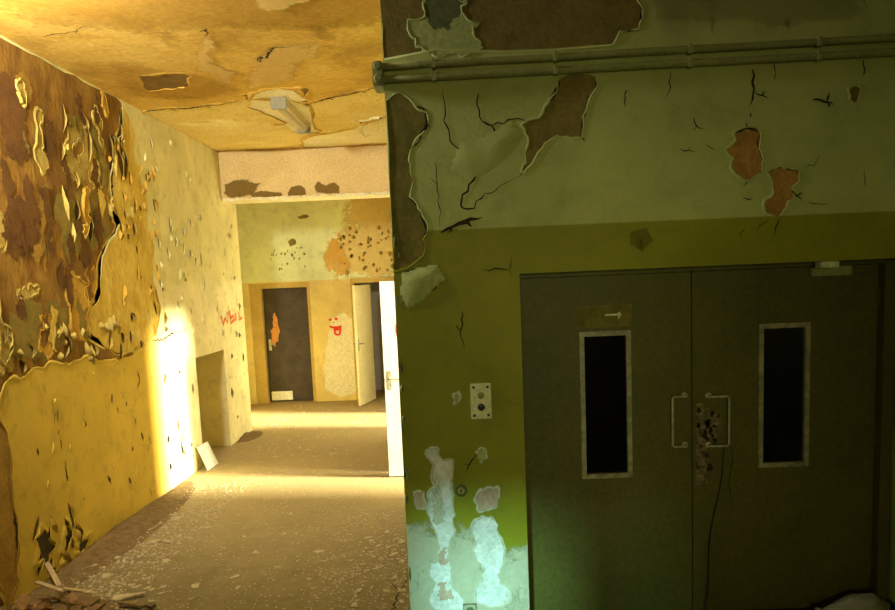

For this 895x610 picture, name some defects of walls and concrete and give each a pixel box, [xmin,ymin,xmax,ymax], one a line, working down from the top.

peeling [380,0,645,61]
peeling [0,36,203,403]
peeling [141,86,430,280]
crack [411,86,459,149]
crack [409,164,523,237]
crack [476,94,525,131]
peeling [520,73,599,175]
crack [736,63,828,205]
crack [813,92,833,107]
spalling [0,419,20,607]
peeling [31,503,92,577]
spalling [405,446,512,610]